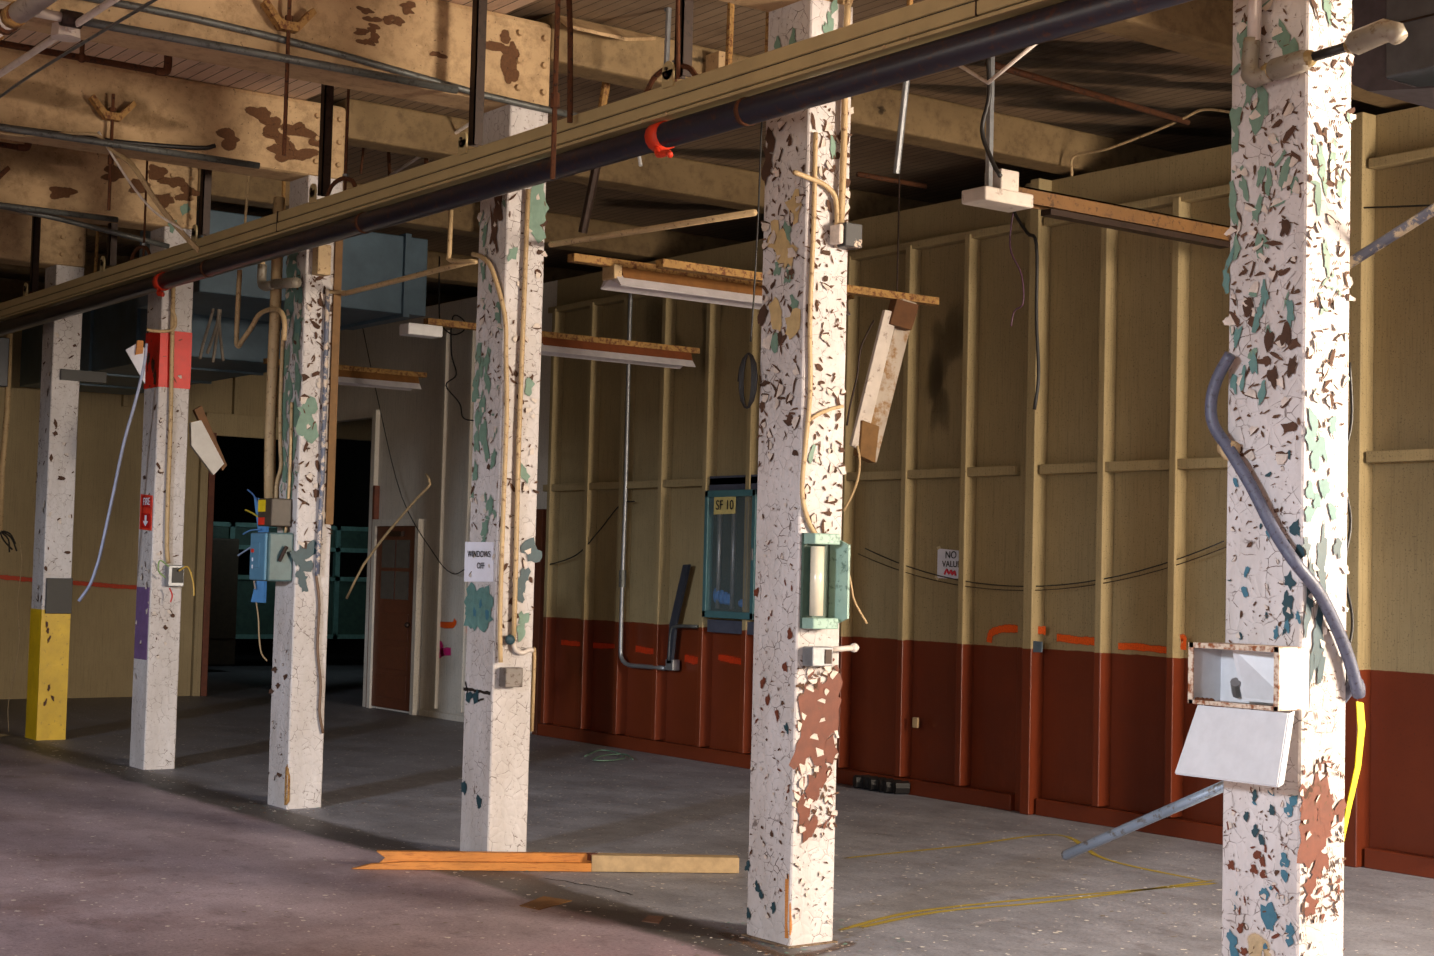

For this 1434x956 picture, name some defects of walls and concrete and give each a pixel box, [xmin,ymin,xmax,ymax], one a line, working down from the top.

peeling [216,128,240,151]
peeling [245,106,320,163]
peeling [353,1,416,46]
peeling [774,28,796,49]
peeling [823,0,838,33]
peeling [279,252,339,592]
peeling [464,183,549,643]
peeling [744,106,854,923]
peeling [1222,0,1356,730]
peeling [1221,754,1347,956]